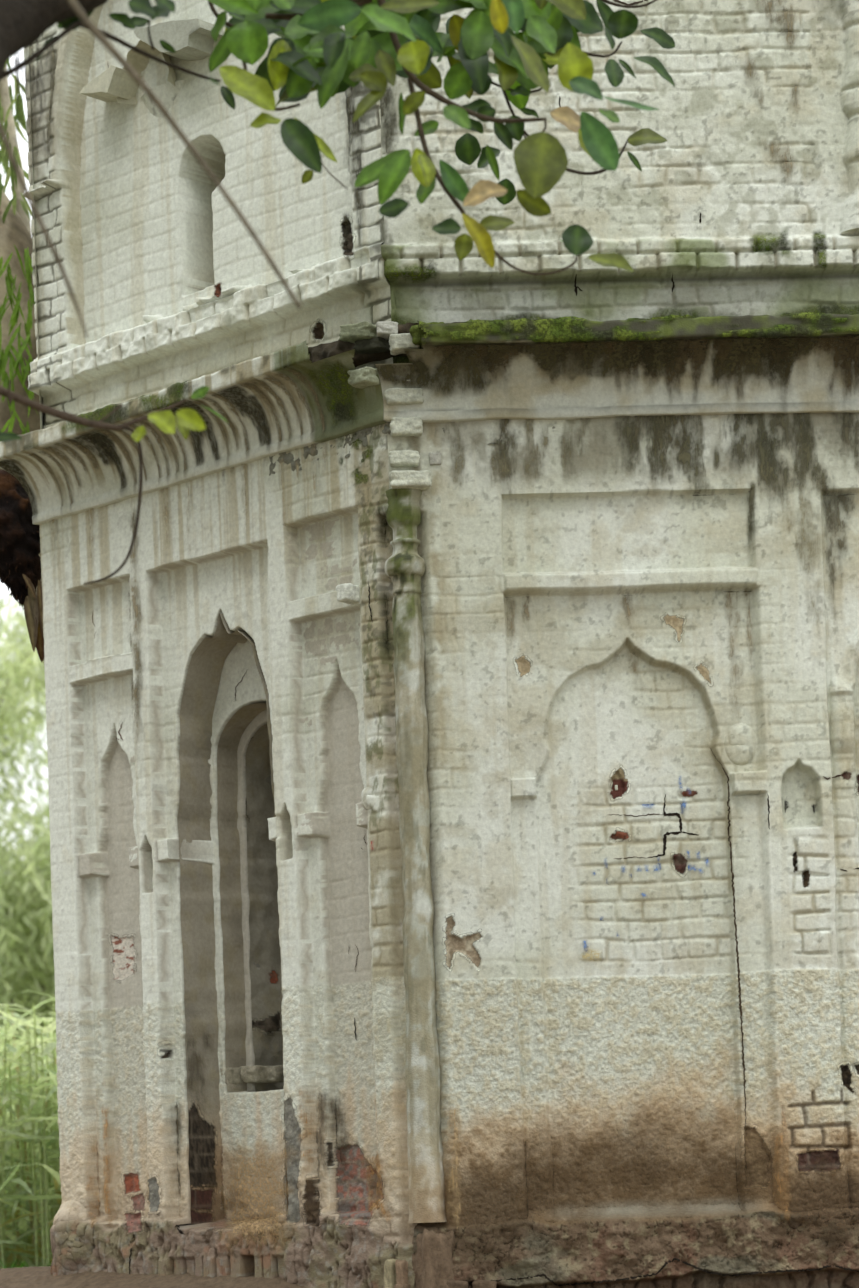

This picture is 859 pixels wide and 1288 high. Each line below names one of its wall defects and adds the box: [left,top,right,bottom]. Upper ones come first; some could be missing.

water stain [376,336,859,394]
water stain [453,430,465,481]
water stain [491,418,585,478]
water stain [616,413,854,586]
spalling [610,765,631,801]
spalling [442,913,482,972]
crack [609,748,747,1136]
spalling [837,1061,859,1094]
spalling [188,1101,218,1225]
spalling [281,1095,385,1228]
water stain [460,1128,758,1257]
crack [470,1258,859,1286]